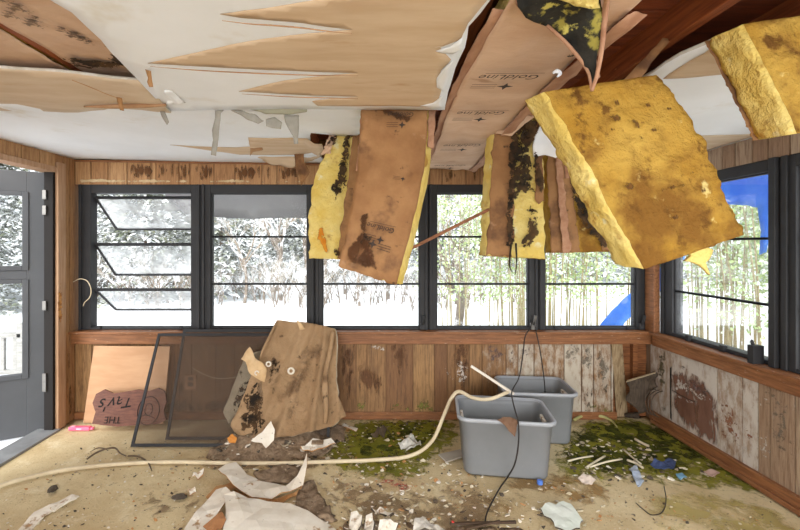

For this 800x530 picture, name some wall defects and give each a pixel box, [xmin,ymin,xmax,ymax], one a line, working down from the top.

water stain [0,0,43,29]
water stain [56,26,92,44]
water stain [59,54,123,69]
water stain [80,164,190,183]
water stain [200,165,269,182]
water stain [279,168,300,182]
water stain [341,349,382,396]